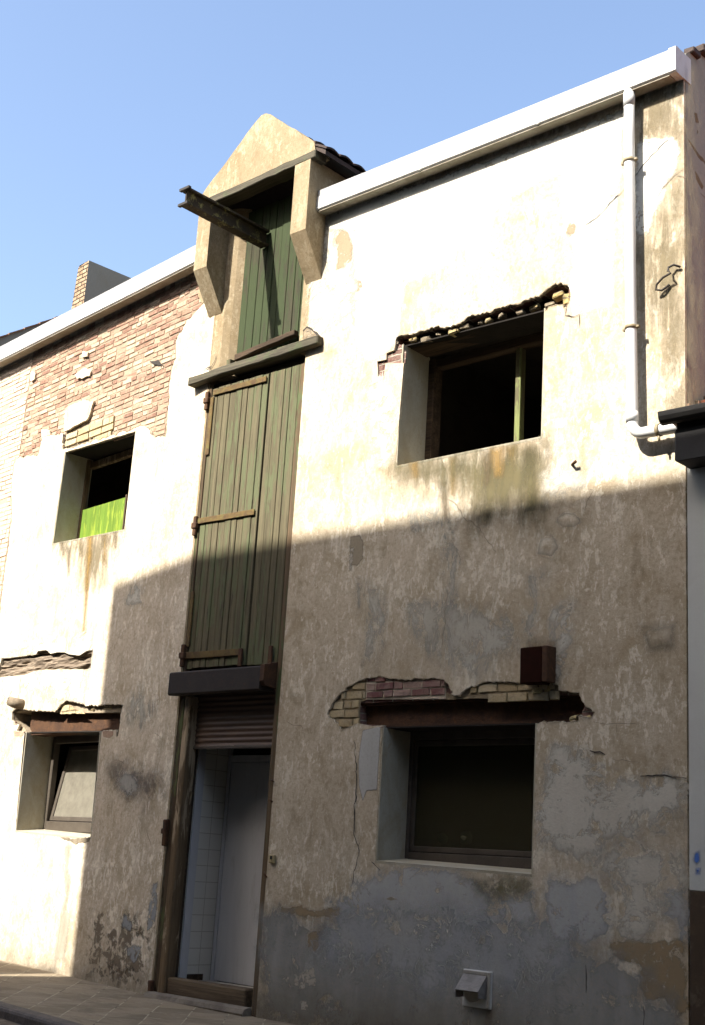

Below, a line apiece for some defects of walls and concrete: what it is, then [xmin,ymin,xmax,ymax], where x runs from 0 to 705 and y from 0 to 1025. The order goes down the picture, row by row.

peeling [303,110,624,467]
flaking render [0,326,184,612]
leakage [396,447,547,522]
leakage [61,535,117,630]
peeling [0,624,153,738]
flaking render [327,604,595,731]
crack [352,742,380,884]
peeling [536,745,689,861]
peeling [88,884,157,986]
peeling [260,889,690,1025]